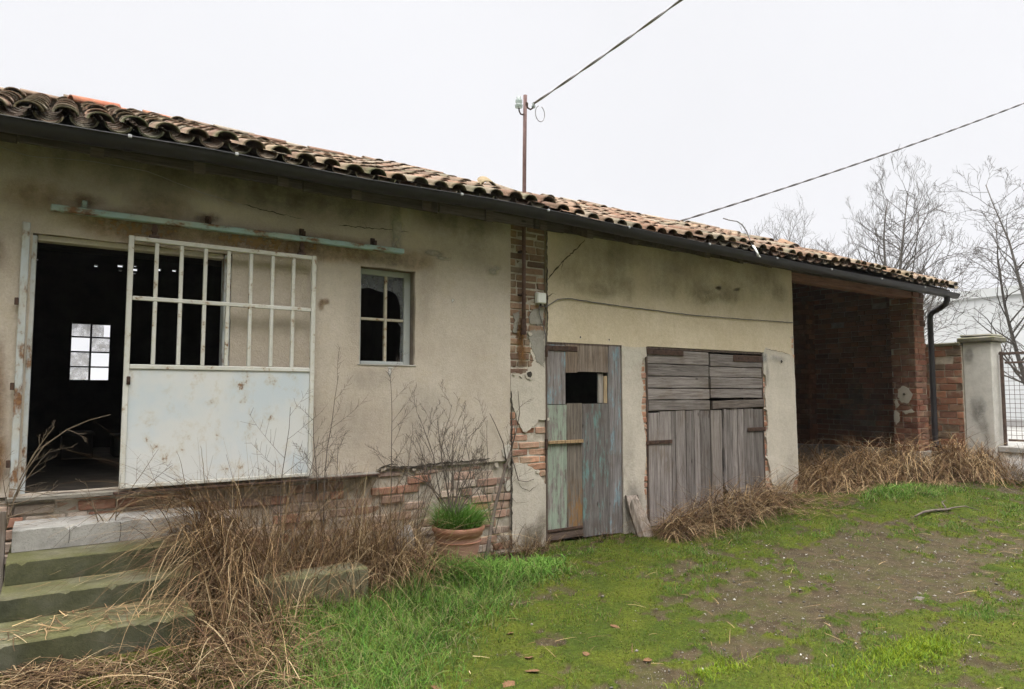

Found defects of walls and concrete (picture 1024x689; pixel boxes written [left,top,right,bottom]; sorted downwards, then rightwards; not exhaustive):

flaking render [510,225,545,380]
crack [546,231,585,335]
flaking render [894,386,914,424]
flaking render [0,403,550,578]